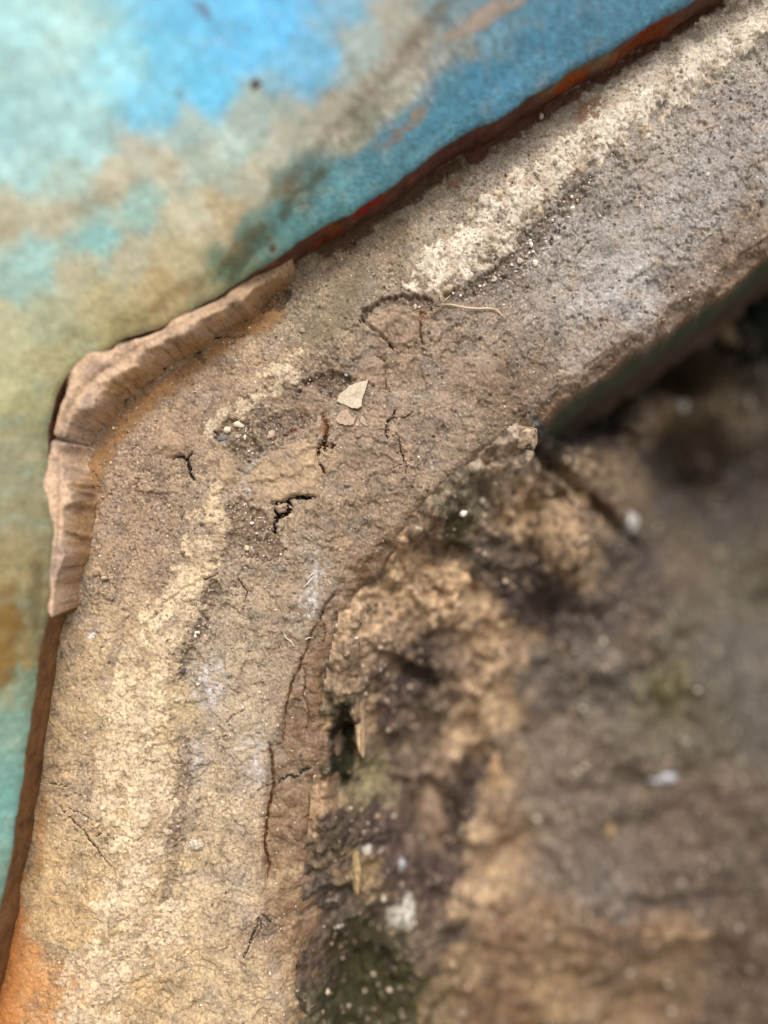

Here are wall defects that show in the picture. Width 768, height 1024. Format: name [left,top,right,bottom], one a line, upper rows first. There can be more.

corrosion [309,2,725,257]
crack [173,451,195,481]
crack [272,416,336,534]
crack [369,309,432,474]
crack [257,595,334,878]